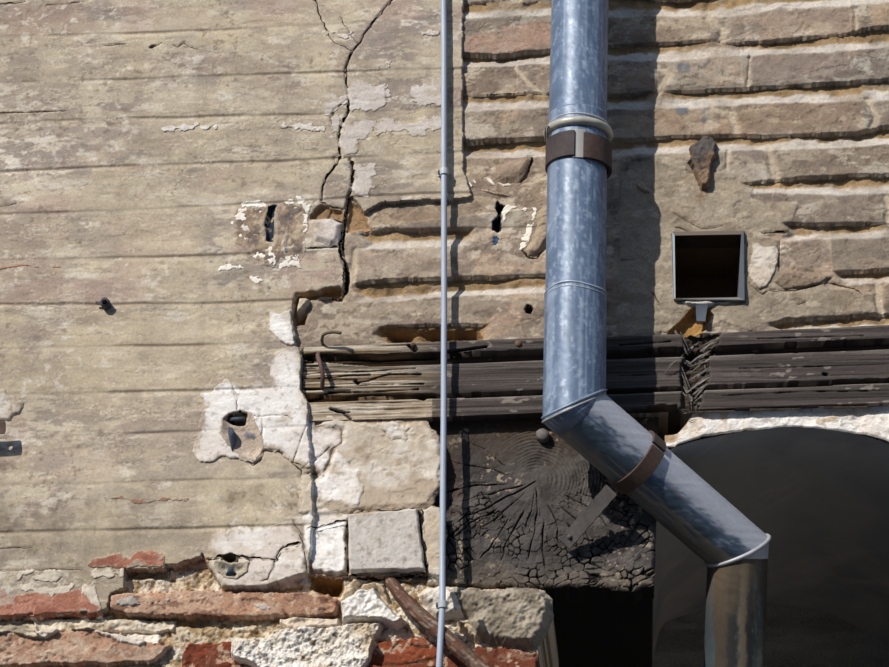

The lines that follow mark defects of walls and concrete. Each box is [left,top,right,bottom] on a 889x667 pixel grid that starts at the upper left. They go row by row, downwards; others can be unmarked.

peeling [161,122,218,133]
peeling [230,77,441,268]
crack [307,0,392,302]
flaking render [0,550,177,646]
flaking render [175,556,209,573]